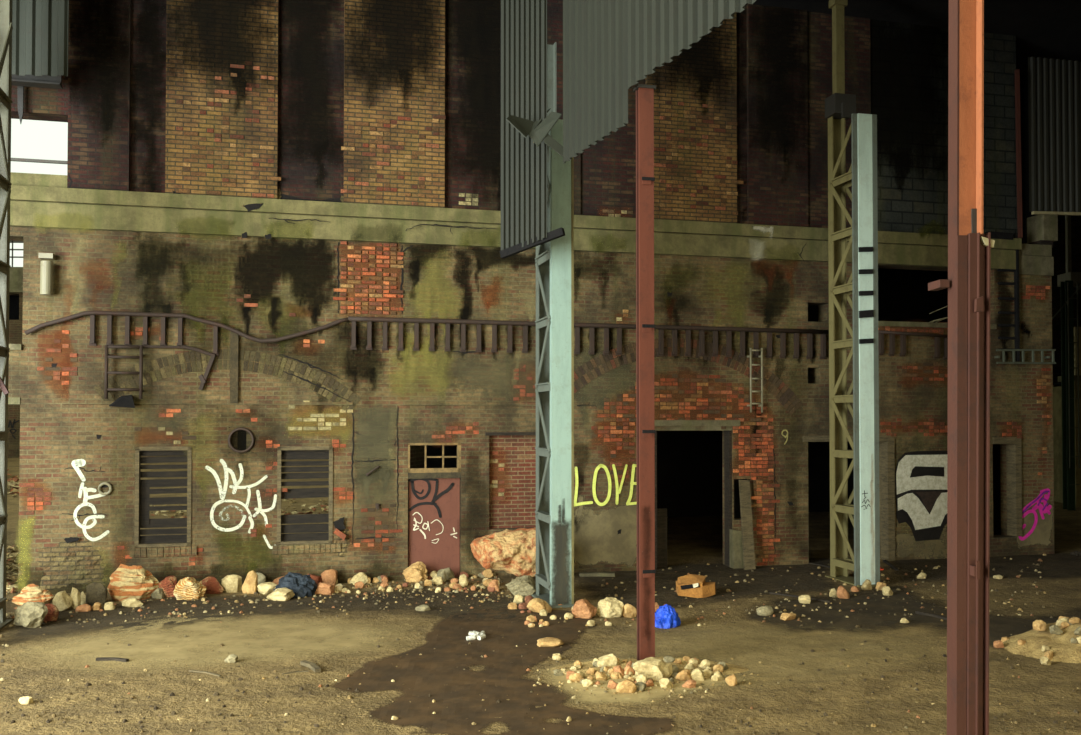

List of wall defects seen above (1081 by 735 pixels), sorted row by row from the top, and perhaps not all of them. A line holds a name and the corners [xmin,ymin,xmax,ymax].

water stain [231,69,246,106]
spalling [333,241,404,315]
water stain [411,261,419,296]
water stain [268,297,282,332]
peeling [574,345,636,490]
spalling [489,451,505,500]
spalling [654,374,795,566]
peeling [574,496,637,567]